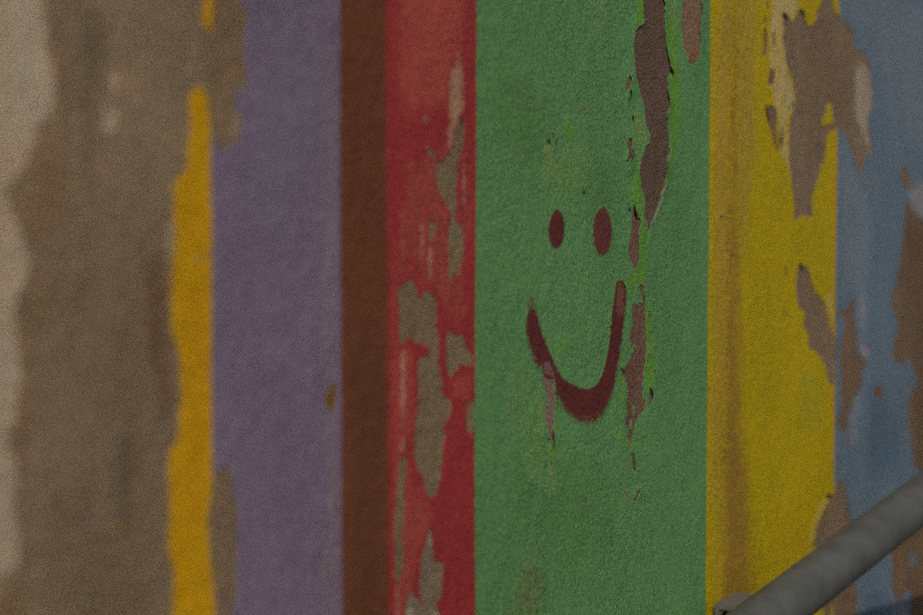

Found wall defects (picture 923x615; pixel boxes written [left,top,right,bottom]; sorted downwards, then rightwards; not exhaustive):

water stain [0,0,55,184]
water stain [73,0,111,239]
peeling [207,0,248,153]
peeling [427,117,465,282]
peeling [626,0,672,268]
peeling [762,0,872,222]
water stain [138,238,209,540]
peeling [394,279,474,583]
peeling [621,285,656,475]
peeling [784,264,866,437]
peeling [891,201,923,471]
peeling [405,529,444,615]